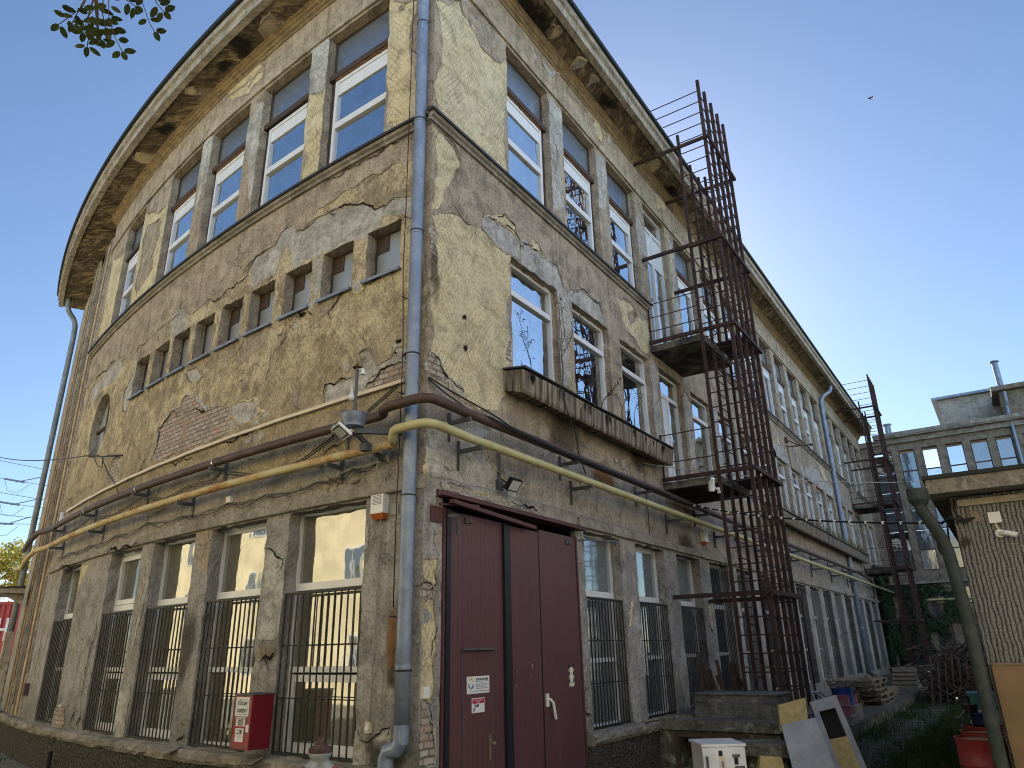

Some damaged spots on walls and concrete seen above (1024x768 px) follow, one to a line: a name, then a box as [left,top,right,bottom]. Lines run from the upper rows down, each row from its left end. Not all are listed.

flaking render [434,0,507,170]
crack [198,200,391,308]
flaking render [62,128,604,518]
flaking render [419,555,440,768]